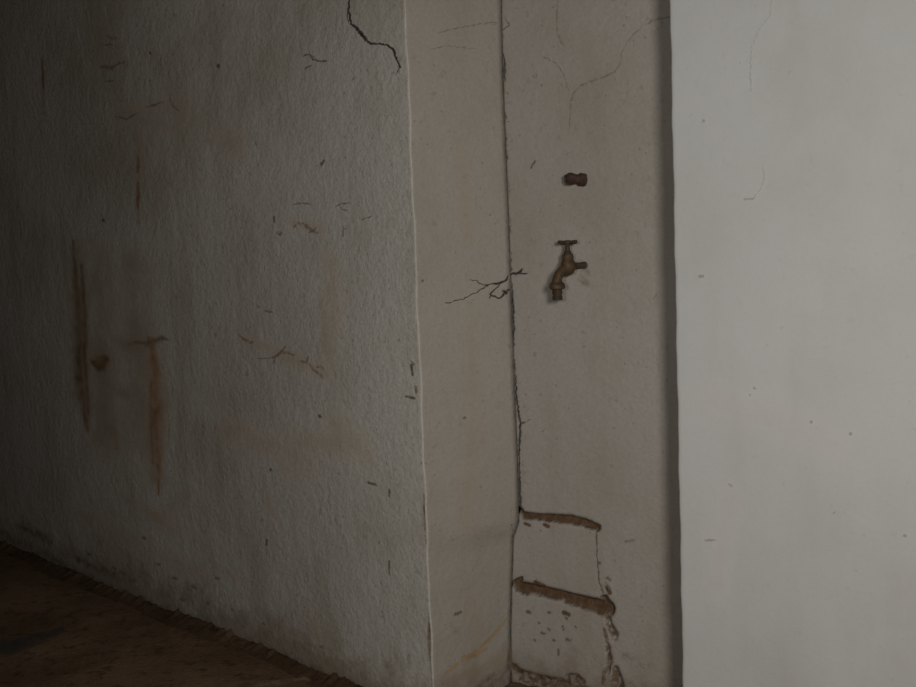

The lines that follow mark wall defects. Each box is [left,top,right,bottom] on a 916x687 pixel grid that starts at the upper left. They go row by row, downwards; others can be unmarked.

crack [347,0,402,73]
crack [430,22,509,80]
corrosion [72,240,109,432]
crack [446,226,531,538]
spalling [520,509,601,533]
spalling [511,576,625,687]